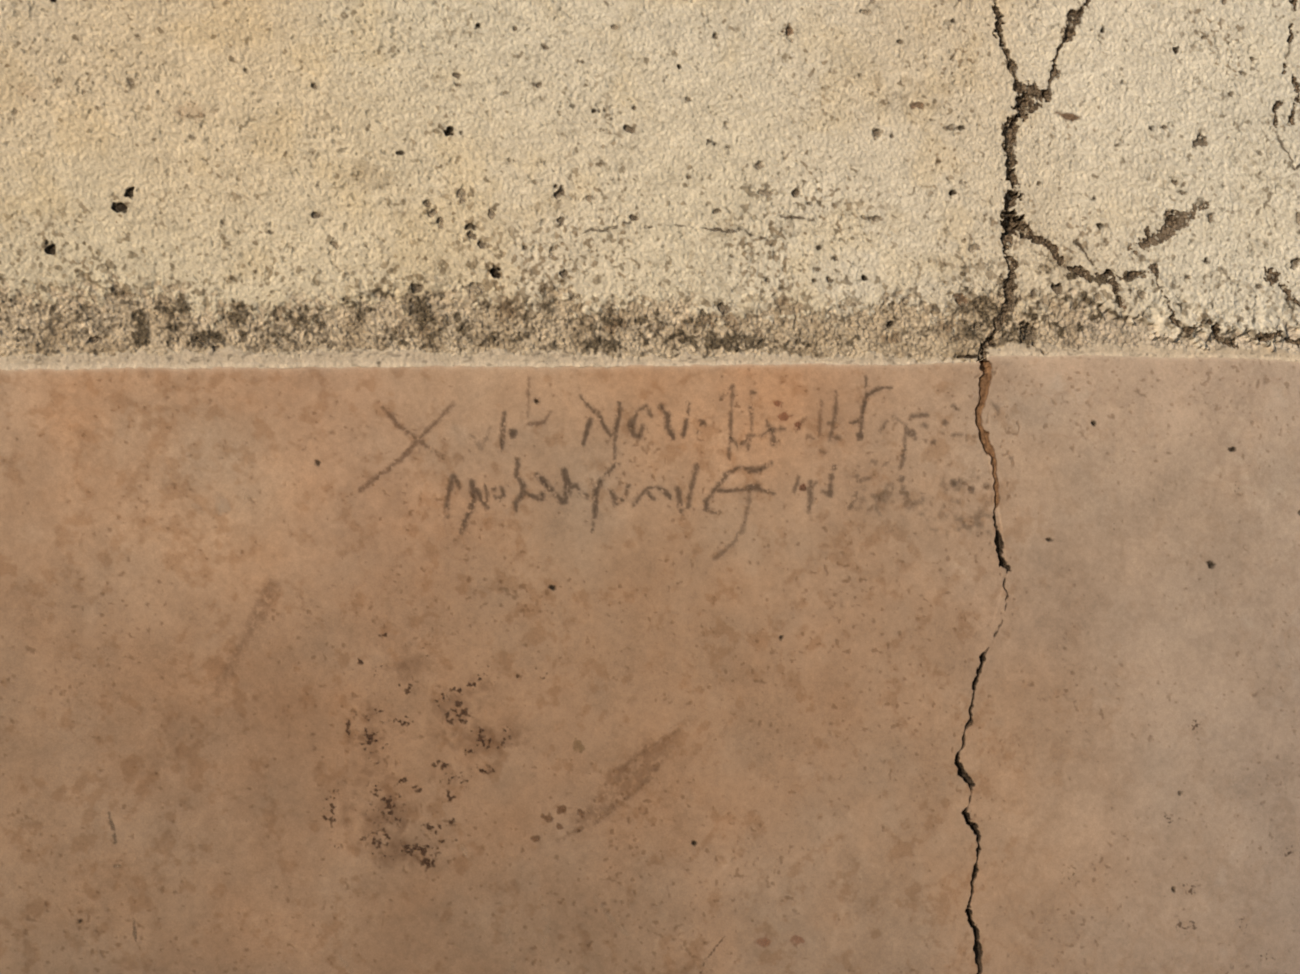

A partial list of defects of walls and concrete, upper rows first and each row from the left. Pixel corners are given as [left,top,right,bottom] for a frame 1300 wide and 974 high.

leakage [50,304,91,334]
leakage [131,294,326,348]
leakage [346,288,393,321]
leakage [377,296,556,349]
leakage [564,304,860,353]
leakage [957,301,983,340]
crack [954,0,1300,974]